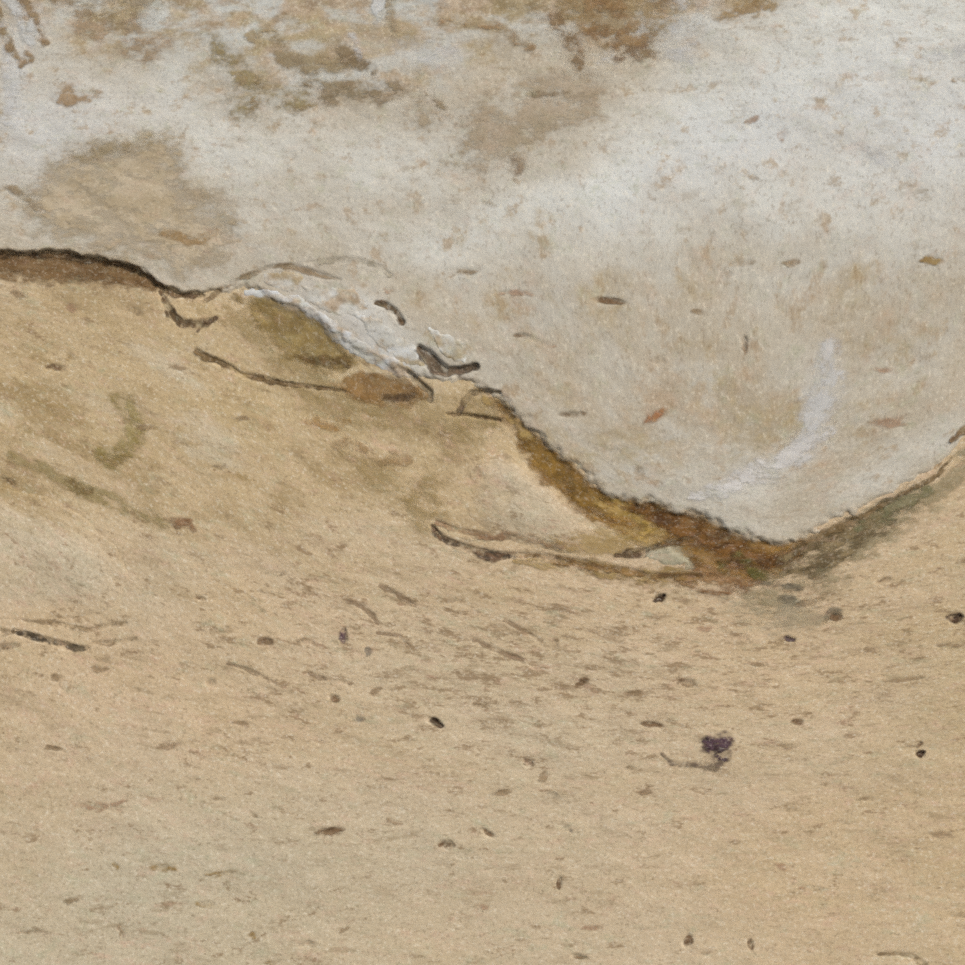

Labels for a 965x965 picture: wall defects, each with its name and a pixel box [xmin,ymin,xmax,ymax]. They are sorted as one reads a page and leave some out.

leakage [371,0,396,30]
leakage [211,42,264,114]
leakage [245,30,405,111]
leakage [462,70,603,174]
crack [0,250,340,391]
flaking render [0,0,965,561]
efflorescence [688,340,844,500]
leakage [552,526,666,554]
flaking render [645,541,696,570]
leakage [744,449,965,609]